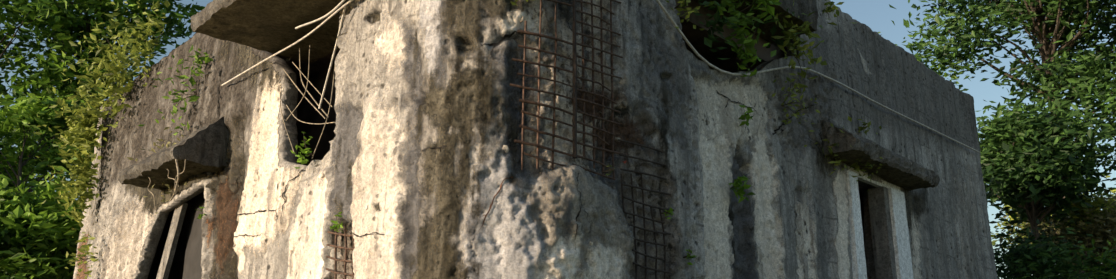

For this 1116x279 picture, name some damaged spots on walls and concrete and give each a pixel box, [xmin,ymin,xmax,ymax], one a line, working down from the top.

corrosion [206,179,239,270]
crack [233,169,304,243]
flaking render [233,68,355,279]
water stain [397,0,537,279]
crack [479,177,513,230]
spalling [463,0,680,279]
corrosion [572,87,646,156]